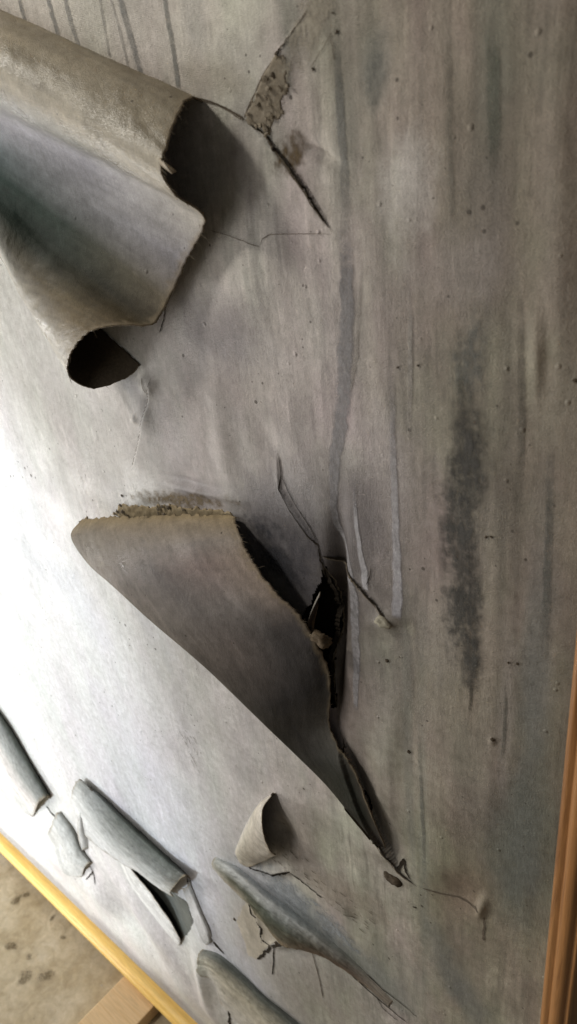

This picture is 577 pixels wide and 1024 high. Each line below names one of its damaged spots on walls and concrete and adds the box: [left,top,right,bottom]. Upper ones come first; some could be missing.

peeling [245,49,289,138]
peeling [113,494,233,518]
crack [278,456,326,577]
damp [440,410,485,686]
peeling [132,869,193,941]
peeling [233,903,278,959]